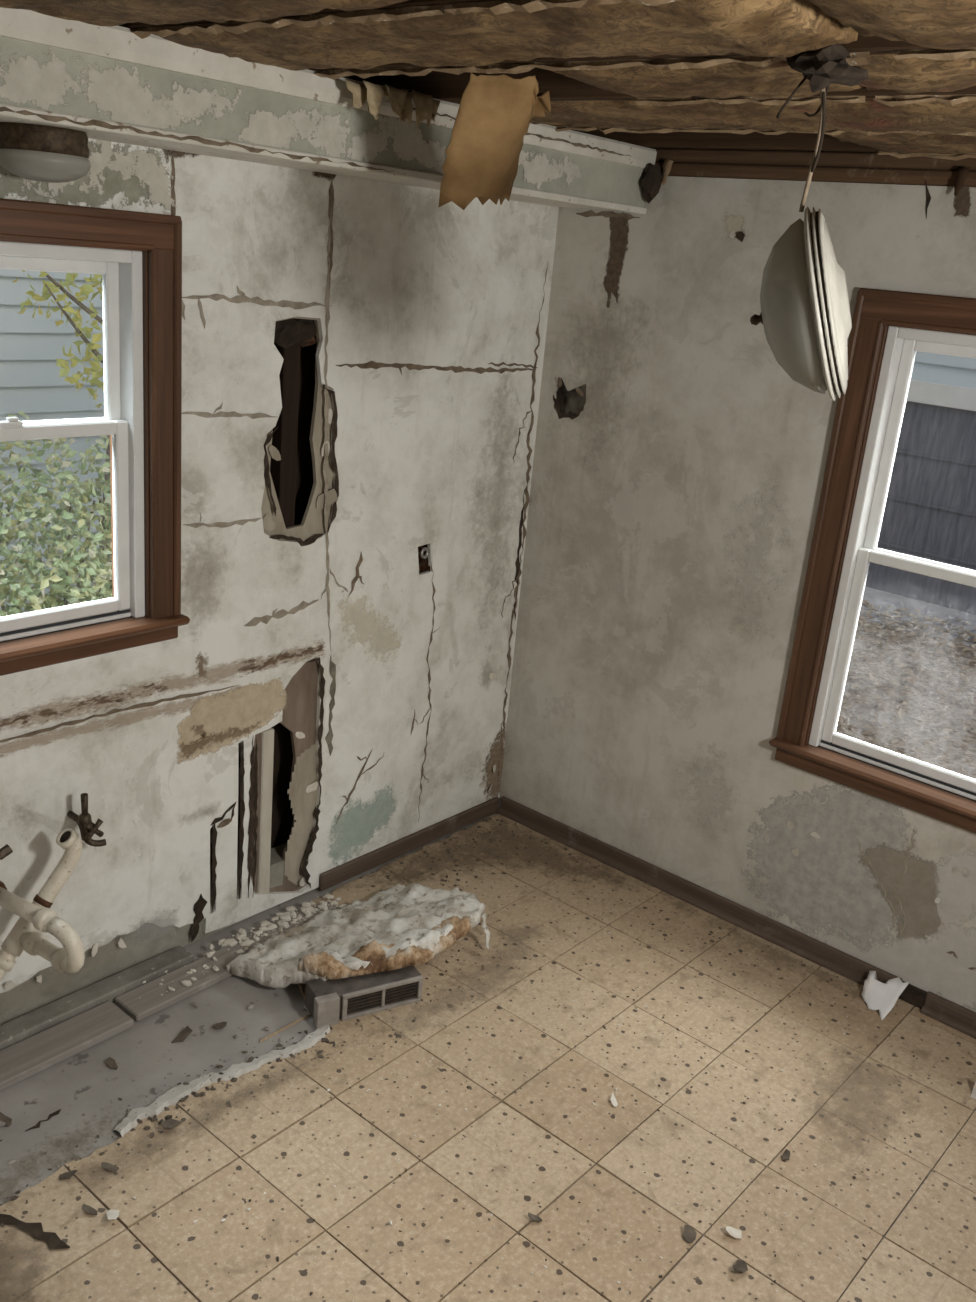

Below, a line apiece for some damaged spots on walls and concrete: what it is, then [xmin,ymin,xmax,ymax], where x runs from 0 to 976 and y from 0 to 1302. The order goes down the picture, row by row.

peeling [0,139,177,215]
crack [526,132,632,157]
crack [0,106,548,824]
spalling [261,316,339,546]
spalling [553,377,586,419]
spalling [177,657,325,942]
flaking render [742,783,976,1009]